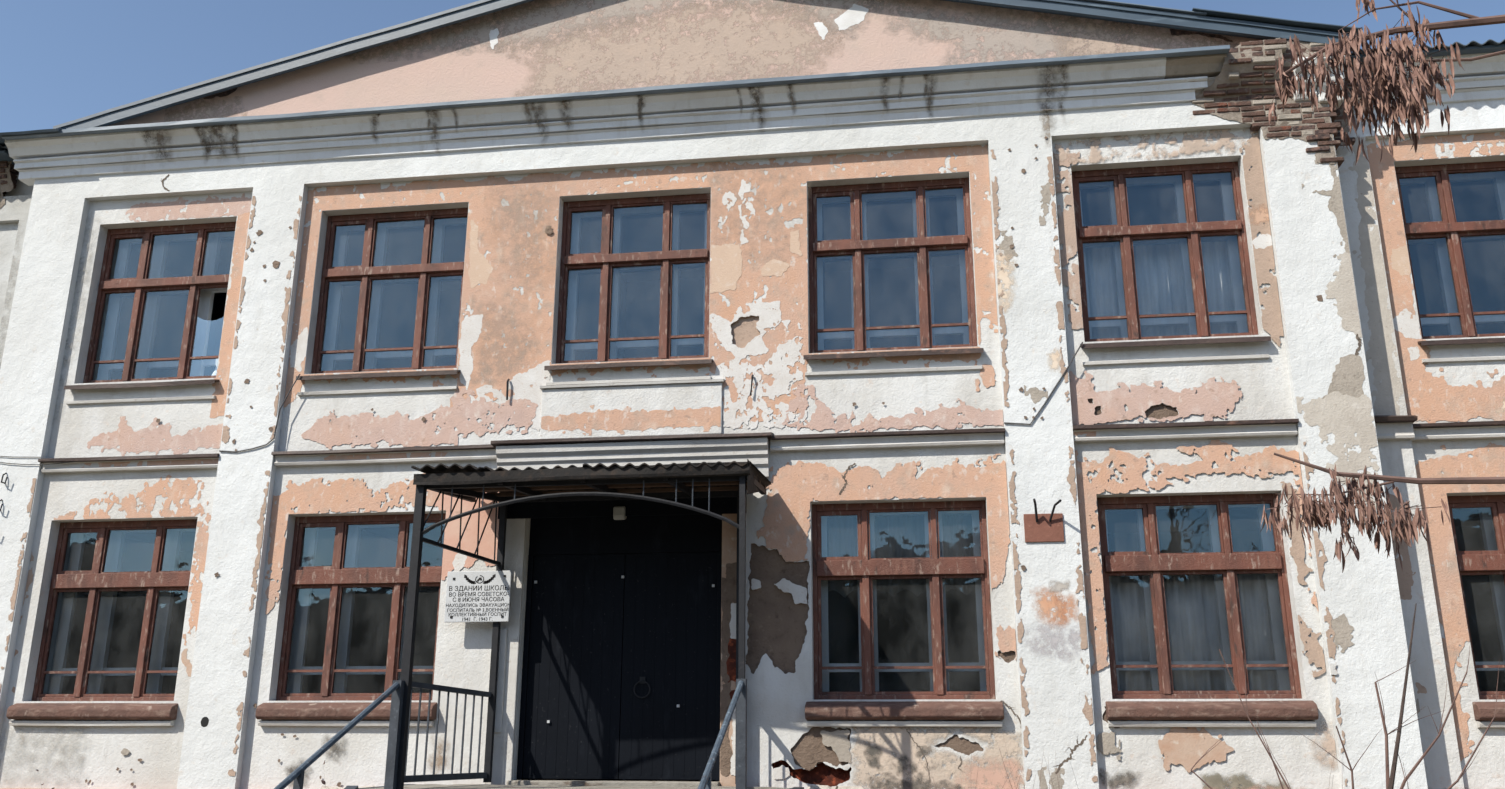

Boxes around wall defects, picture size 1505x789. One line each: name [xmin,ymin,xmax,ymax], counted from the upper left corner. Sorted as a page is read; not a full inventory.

peeling [54,145,1018,677]
flaking render [772,727,851,787]
peeling [720,449,1026,777]
flaking render [1019,29,1505,786]